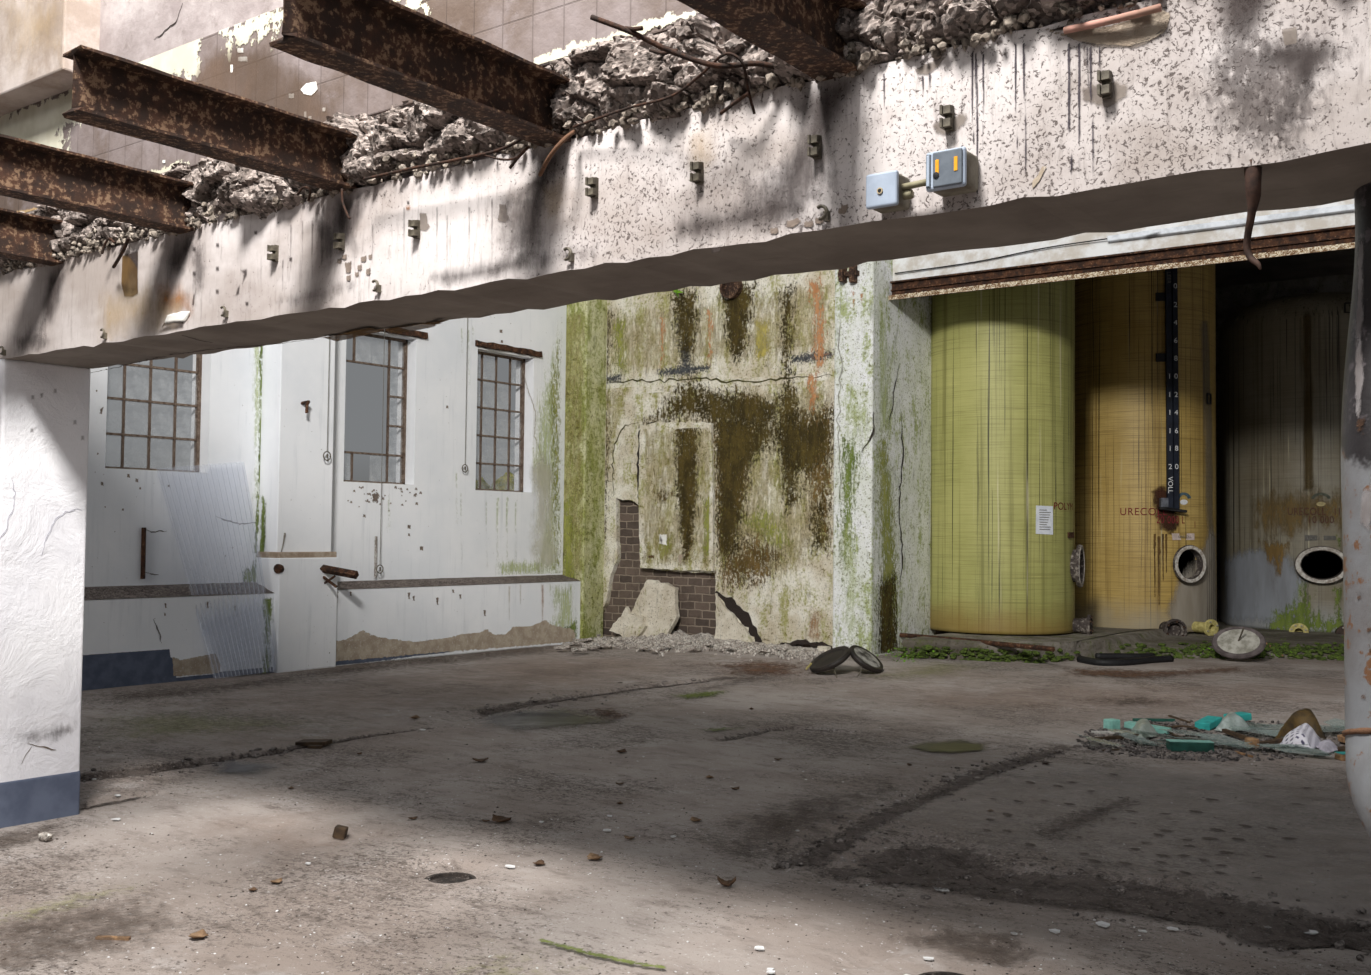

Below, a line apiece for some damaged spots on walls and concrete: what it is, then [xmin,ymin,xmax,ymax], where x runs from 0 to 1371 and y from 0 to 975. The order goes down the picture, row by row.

damp [1282,27,1297,45]
spalling [0,0,1170,275]
peeling [337,254,372,281]
damp [606,314,630,383]
damp [657,342,714,378]
damp [788,349,835,365]
damp [678,455,694,564]
peeling [336,620,576,661]
peeling [172,654,220,676]